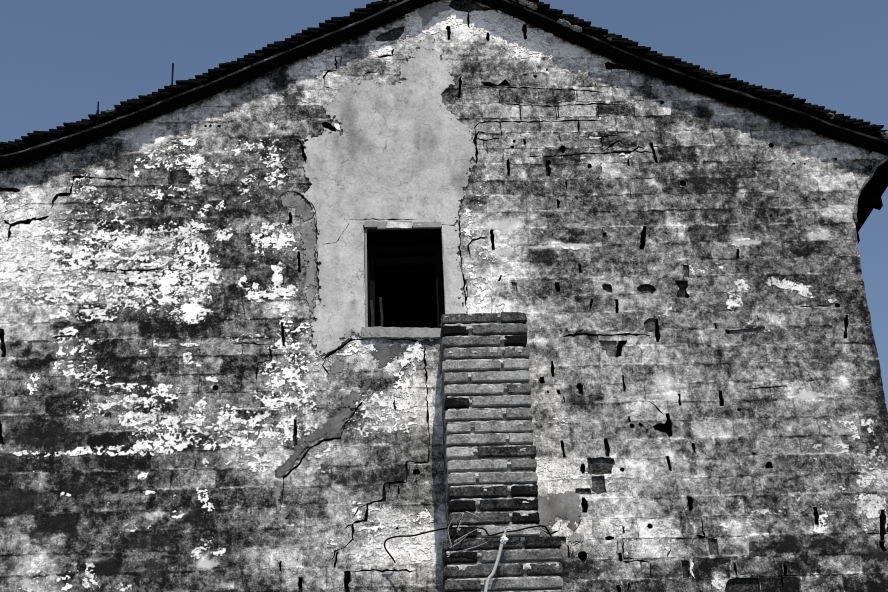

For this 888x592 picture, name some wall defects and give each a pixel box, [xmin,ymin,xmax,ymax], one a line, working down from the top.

crack [473,131,485,163]
crack [4,175,127,241]
damp [531,228,602,265]
peeling [766,276,814,309]
peeling [346,339,426,437]
damp [0,424,125,588]
peeling [196,487,215,513]
crack [280,392,374,511]
damp [315,464,409,499]
crack [322,339,430,573]
spalling [535,456,625,494]
damp [115,508,213,582]